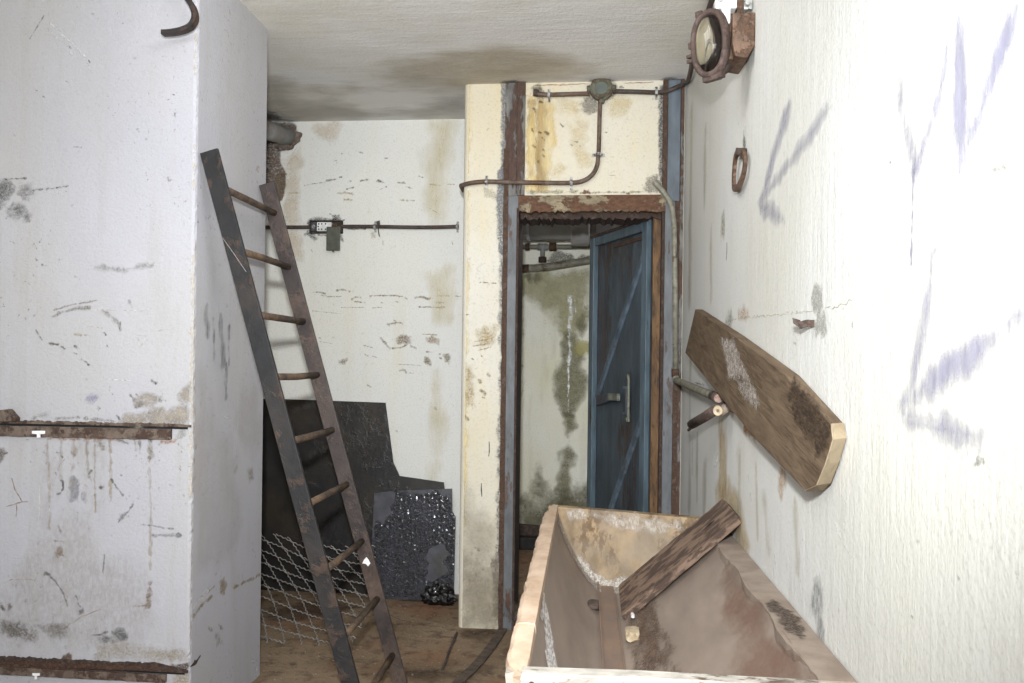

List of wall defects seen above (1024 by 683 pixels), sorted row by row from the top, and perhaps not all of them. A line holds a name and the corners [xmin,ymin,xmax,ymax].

spalling [266,141,286,201]
crack [729,299,853,321]
leakage [522,272,589,432]
leakage [558,448,574,498]